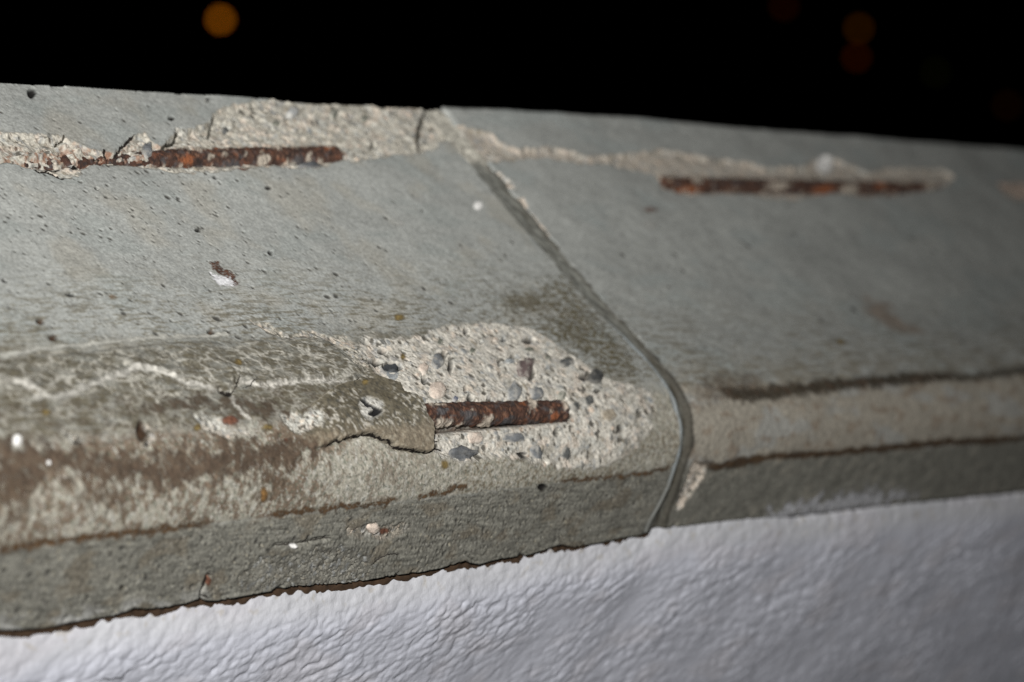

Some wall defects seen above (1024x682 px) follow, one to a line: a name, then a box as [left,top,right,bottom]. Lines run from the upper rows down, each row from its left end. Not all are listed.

spalling [0,98,447,180]
spalling [457,125,954,236]
corrosion [210,261,238,286]
spalling [254,321,656,471]